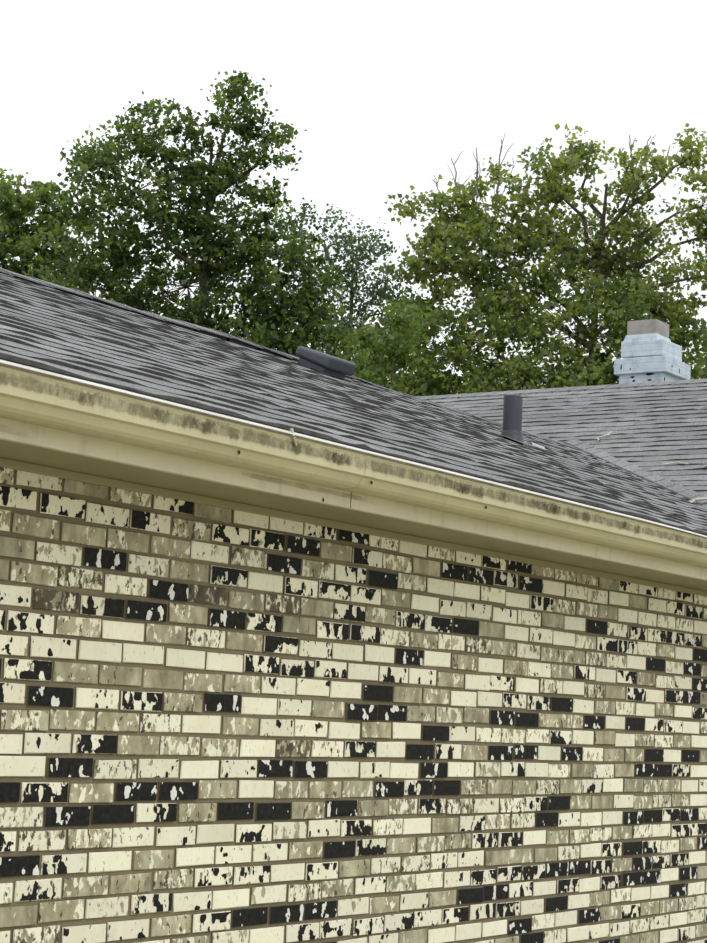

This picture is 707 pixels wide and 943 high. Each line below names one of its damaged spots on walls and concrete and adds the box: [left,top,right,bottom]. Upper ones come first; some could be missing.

water stain [118,402,705,547]
flaking render [82,580,189,622]
peeling [210,525,398,689]
flaking render [398,601,492,635]
flaking render [442,554,553,611]
flaking render [0,593,74,707]
peeling [122,691,163,711]
flaking render [205,694,241,712]
flaking render [491,676,573,727]
flaking render [247,760,327,777]
flaking render [489,745,538,776]
flaking render [0,832,67,901]